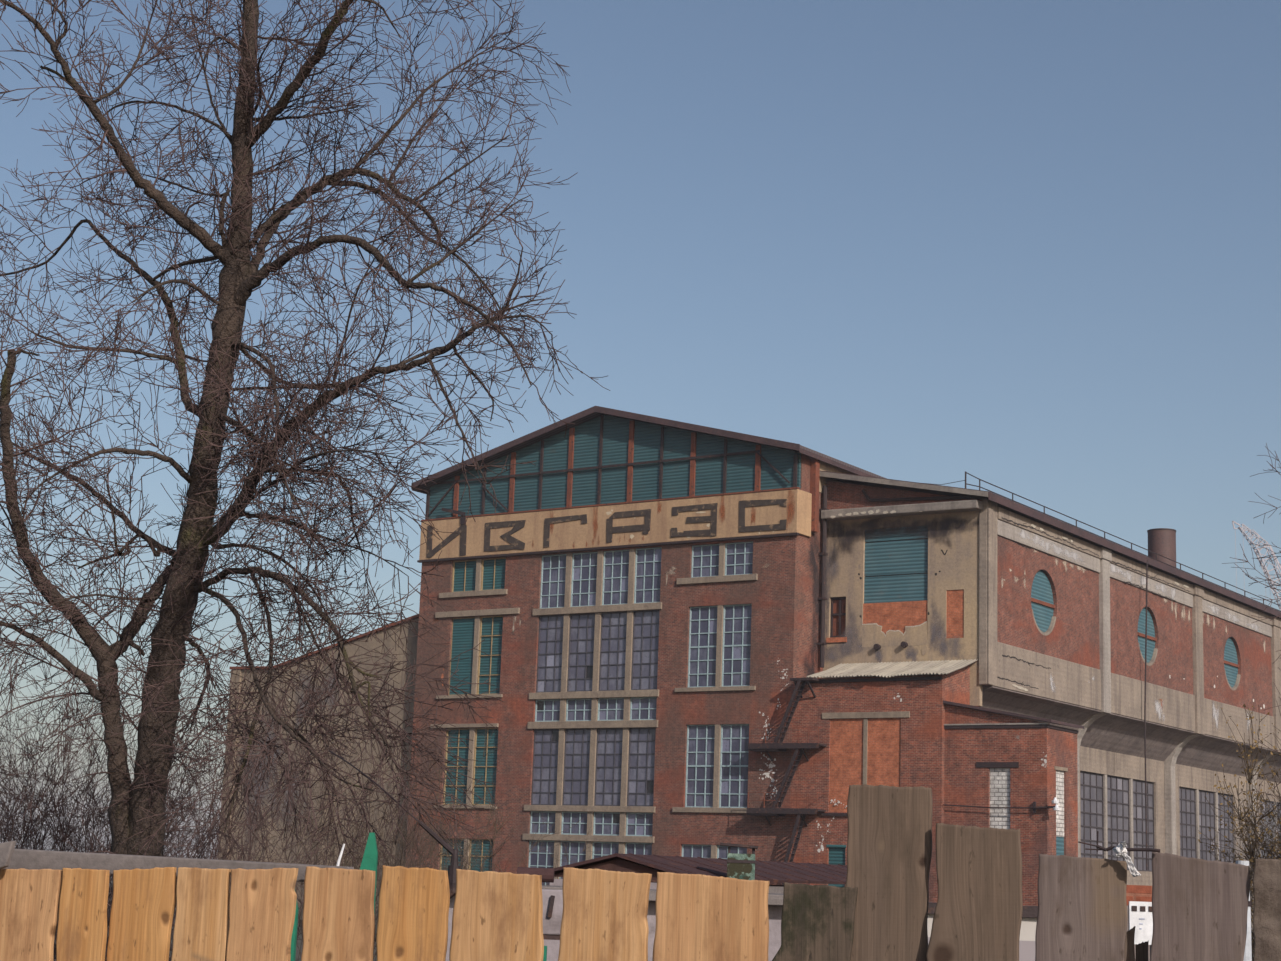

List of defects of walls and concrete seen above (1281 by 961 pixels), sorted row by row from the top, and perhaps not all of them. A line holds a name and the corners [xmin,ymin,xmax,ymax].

spalling [859,612,930,647]